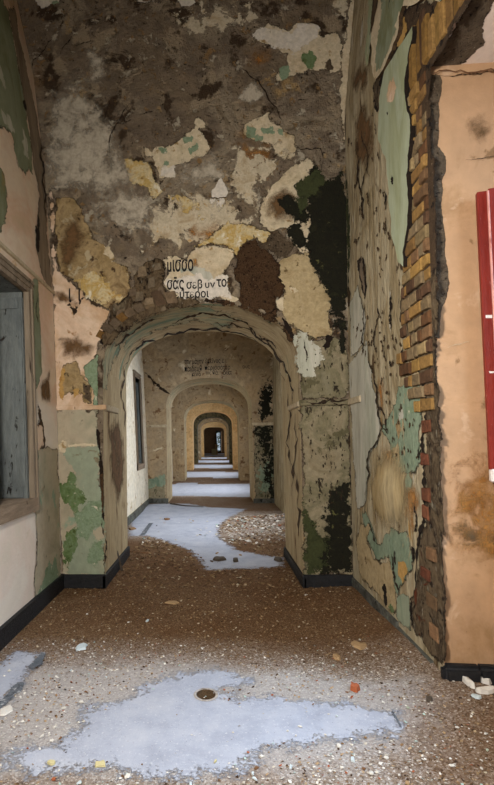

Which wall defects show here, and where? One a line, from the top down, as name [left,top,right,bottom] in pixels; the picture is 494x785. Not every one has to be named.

flaking render [0,0,242,406]
water stain [277,165,350,354]
peeling [34,406,108,597]
peeling [148,474,166,498]
water stain [258,379,273,420]
water stain [457,471,494,555]